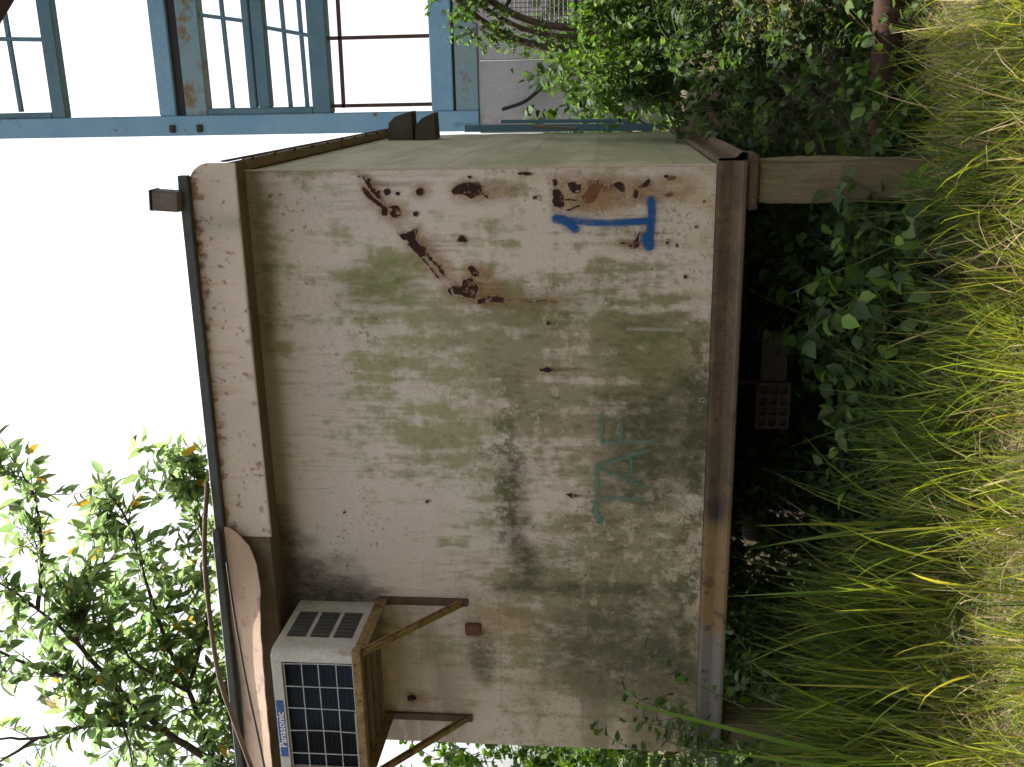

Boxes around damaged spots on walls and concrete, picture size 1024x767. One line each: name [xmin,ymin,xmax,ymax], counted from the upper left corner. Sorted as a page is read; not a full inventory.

peeling [358,174,402,219]
spalling [451,181,503,199]
spalling [551,178,584,212]
spalling [619,232,641,250]
peeling [397,228,499,300]
leakage [620,398,674,492]